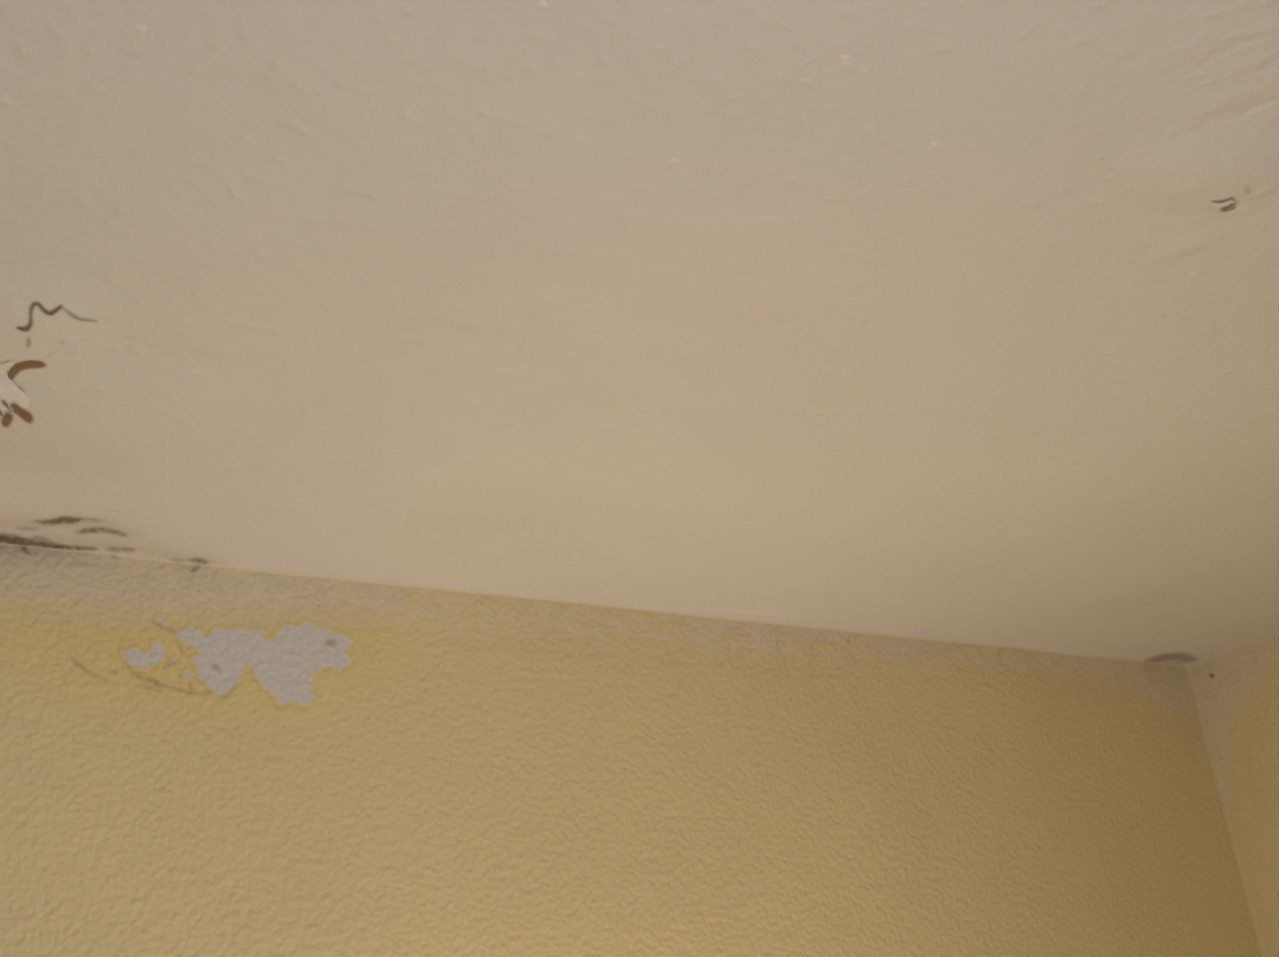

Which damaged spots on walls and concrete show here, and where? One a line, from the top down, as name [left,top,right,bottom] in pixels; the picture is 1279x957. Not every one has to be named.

crack [17,303,83,358]
peeling [0,265,123,427]
leakage [0,506,246,567]
peeling [119,619,355,710]